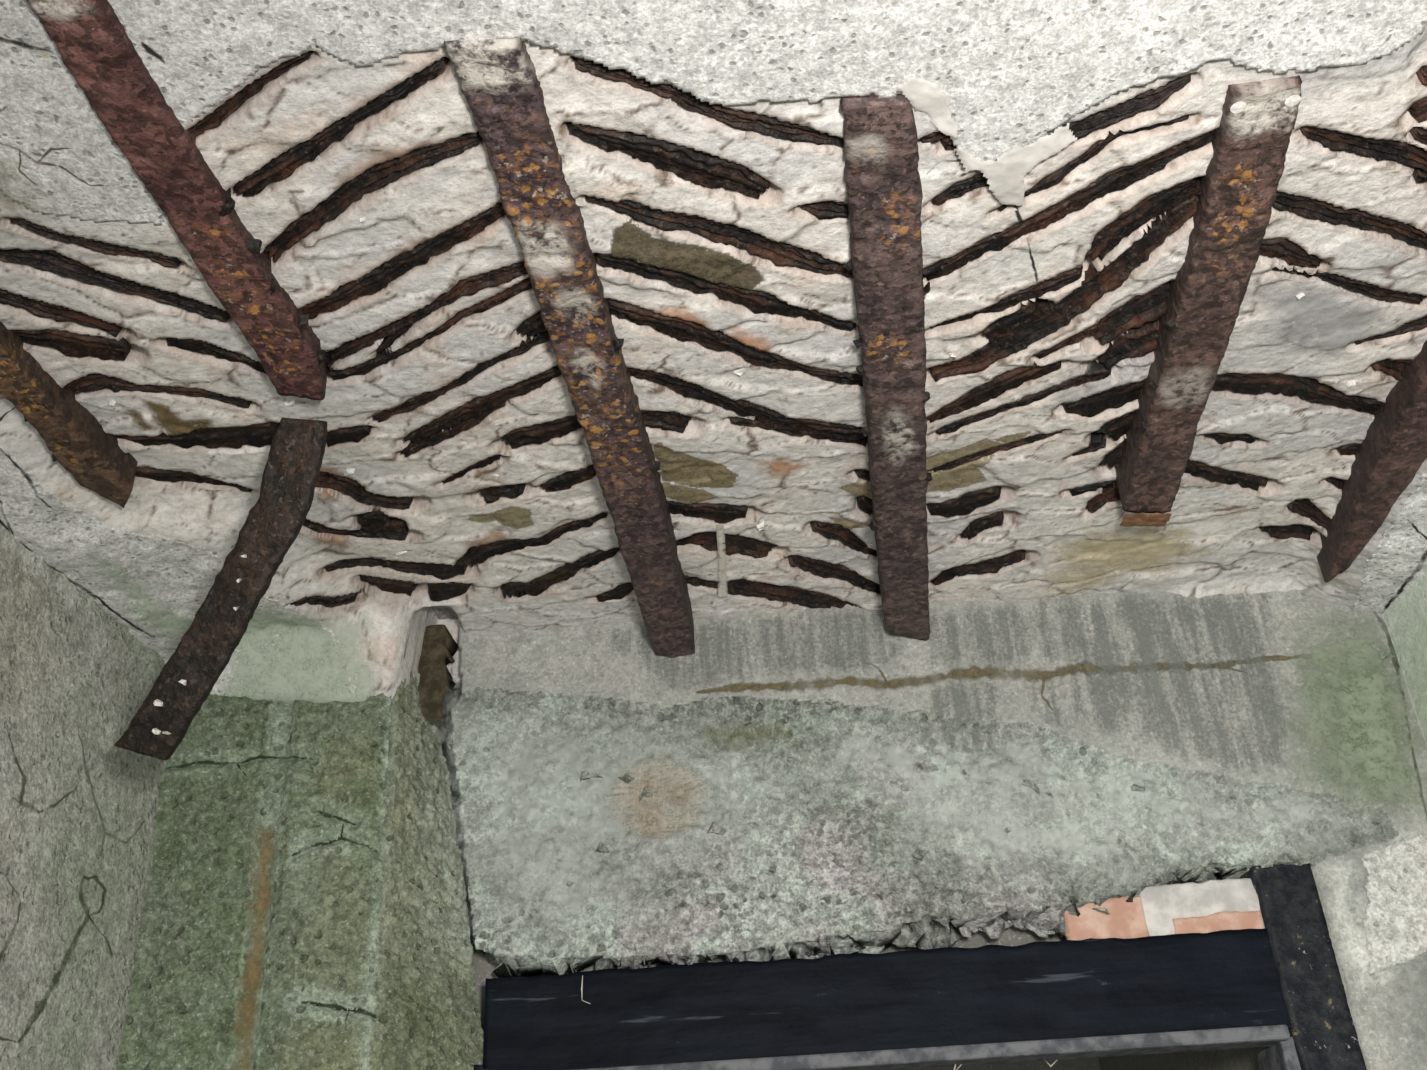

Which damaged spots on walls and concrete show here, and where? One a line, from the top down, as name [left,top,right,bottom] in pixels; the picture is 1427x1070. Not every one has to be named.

crack [0,38,52,52]
corrosion [219,196,235,217]
corrosion [246,238,262,254]
spalling [0,34,644,699]
corrosion [613,338,624,353]
spalling [524,41,883,621]
corrosion [853,338,866,375]
spalling [911,25,1427,607]
corrosion [317,533,346,548]
crack [1382,520,1427,817]
crack [0,733,145,1043]
spalling [441,687,1427,978]